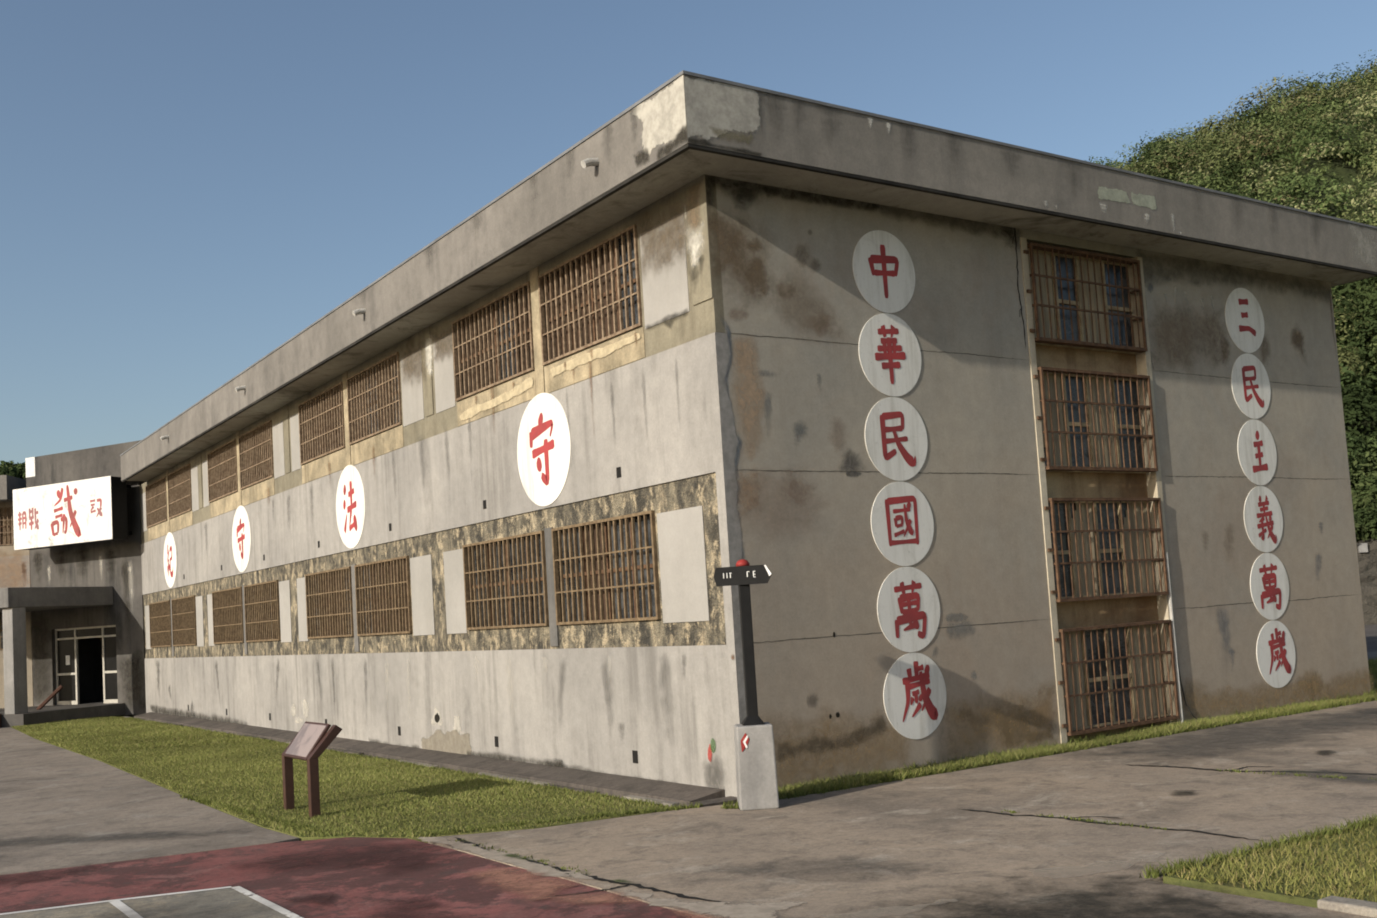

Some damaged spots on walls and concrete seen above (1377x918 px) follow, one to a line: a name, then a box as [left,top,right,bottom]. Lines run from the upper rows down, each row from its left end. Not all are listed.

peeling [632,75,761,155]
leakage [641,176,878,294]
crack [1012,228,1026,347]